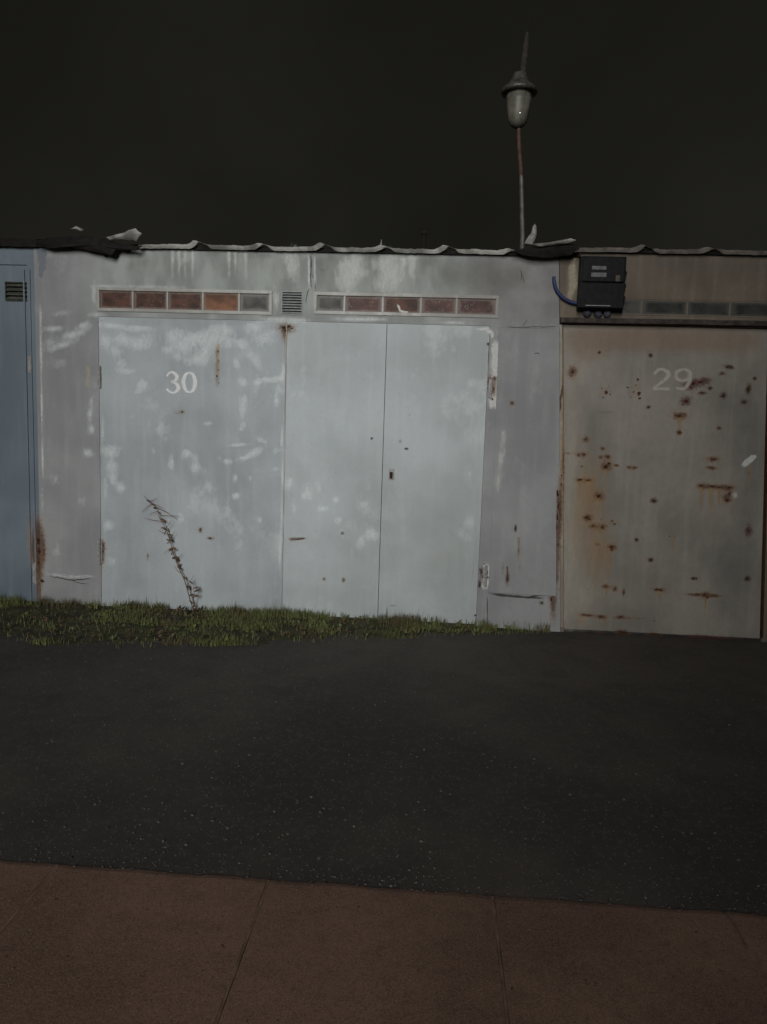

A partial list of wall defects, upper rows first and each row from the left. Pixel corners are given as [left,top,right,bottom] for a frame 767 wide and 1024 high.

rust [674,378,726,418]
rust [556,437,591,583]
rust [698,484,733,502]
rust [31,522,46,589]